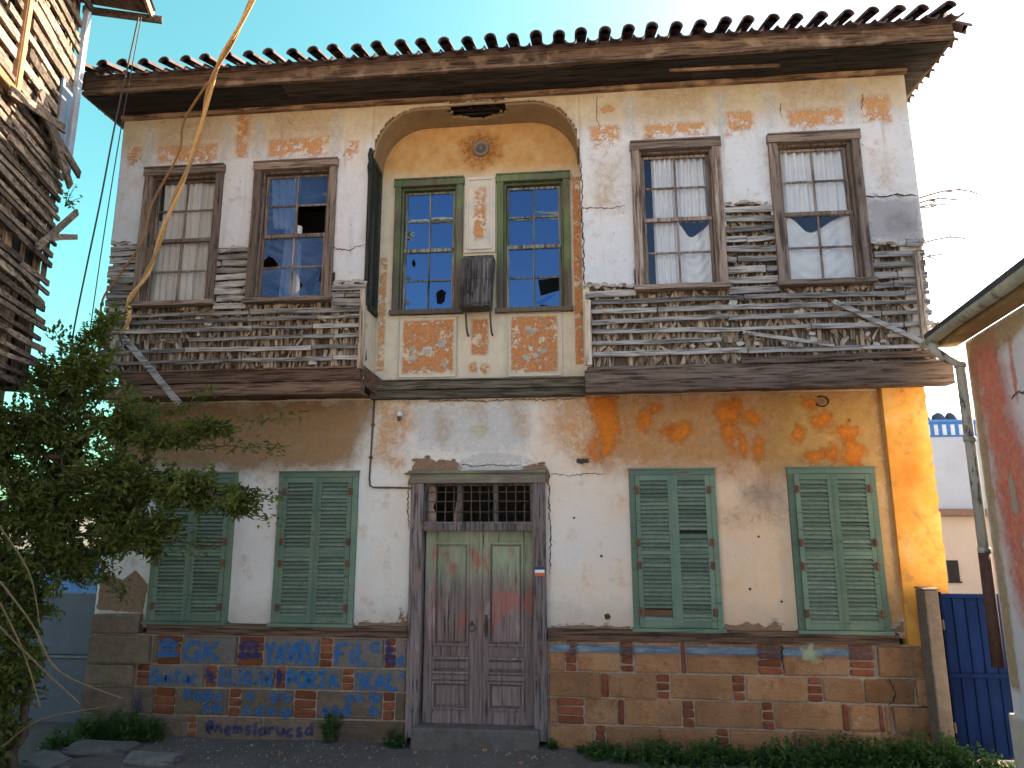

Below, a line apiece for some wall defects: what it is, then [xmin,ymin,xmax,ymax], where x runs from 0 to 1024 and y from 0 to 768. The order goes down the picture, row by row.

peeling [268,138,327,157]
peeling [646,122,706,139]
peeling [788,108,843,130]
crack [866,192,916,200]
peeling [572,177,634,364]
peeling [402,320,453,373]
peeling [511,316,557,372]
peeling [555,396,619,465]
peeling [714,398,763,462]
peeling [792,395,865,466]
crack [548,472,606,573]
flaking render [96,571,148,613]